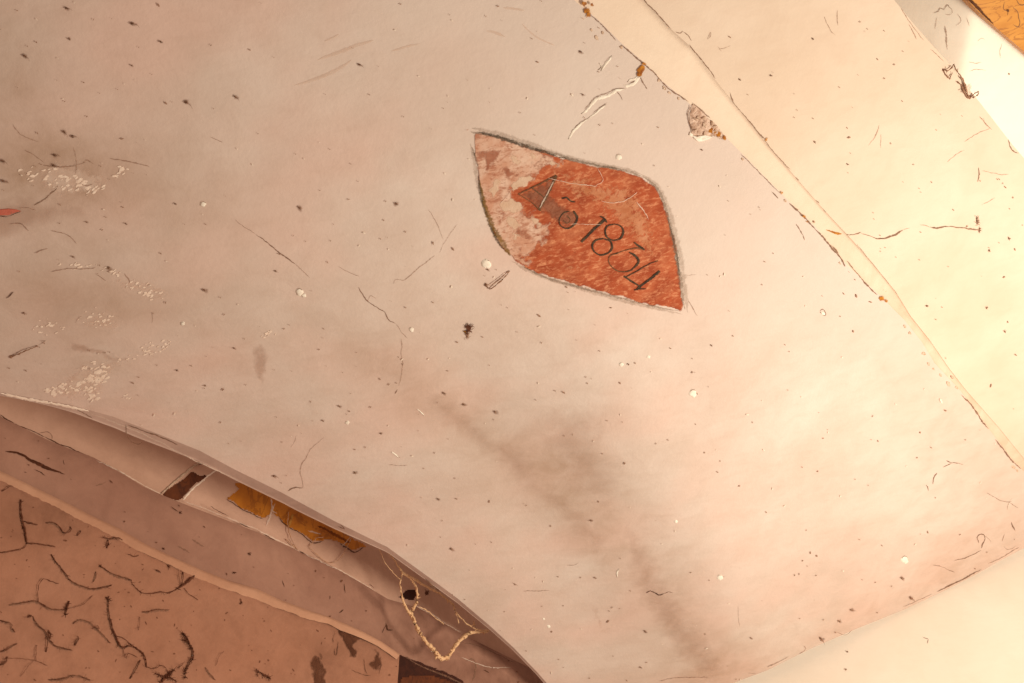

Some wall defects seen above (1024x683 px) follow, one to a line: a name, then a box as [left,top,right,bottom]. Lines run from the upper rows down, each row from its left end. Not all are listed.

crack [569,14,687,139]
flaking render [687,104,726,142]
crack [644,0,1017,294]
peeling [1,340,375,591]
crack [903,325,1021,472]